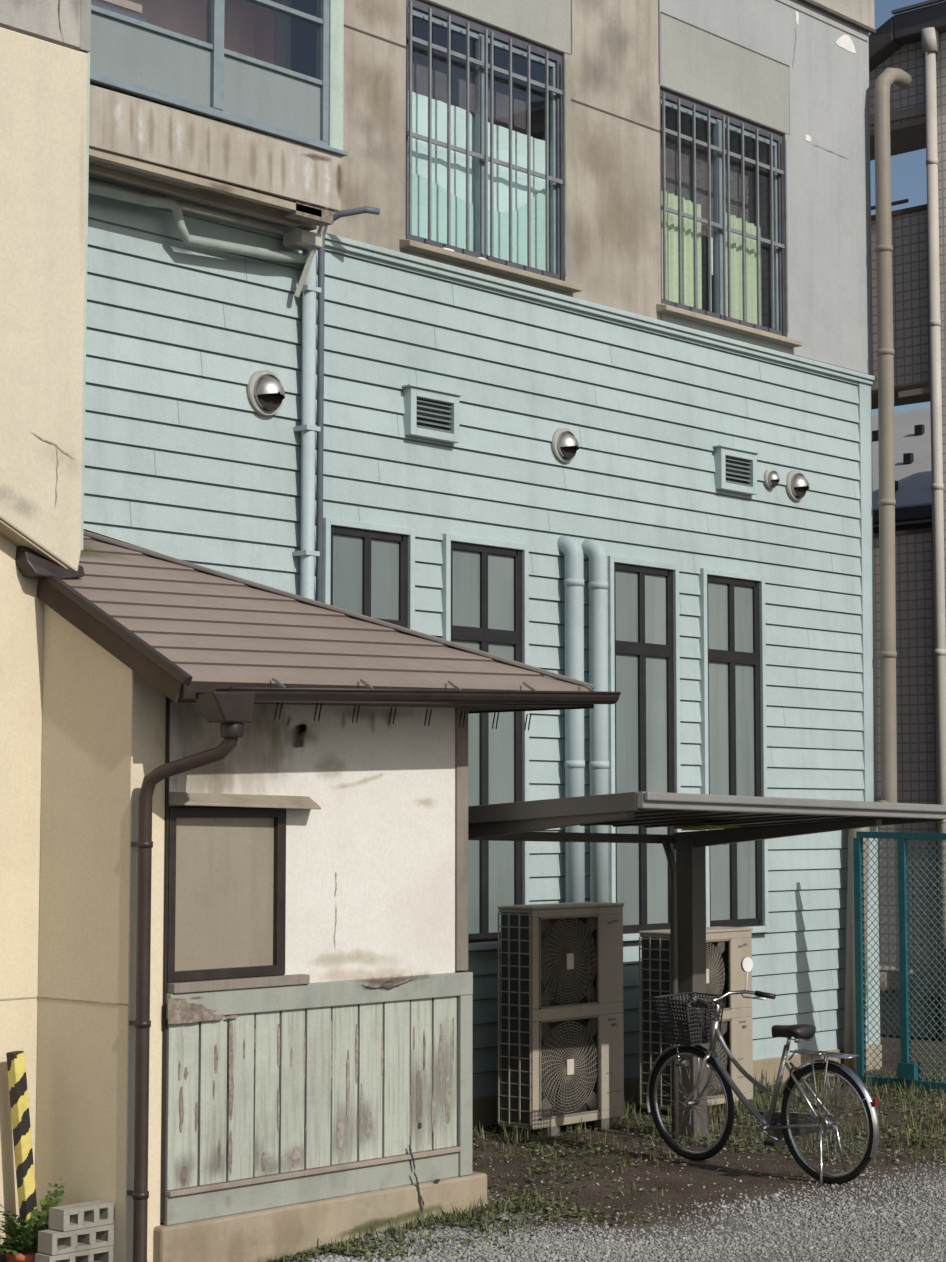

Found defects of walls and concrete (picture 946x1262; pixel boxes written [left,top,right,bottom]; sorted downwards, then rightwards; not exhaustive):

crack [31,431,74,508]
peeling [277,1024,305,1082]
peeling [331,1020,372,1149]
crack [409,1145,424,1211]